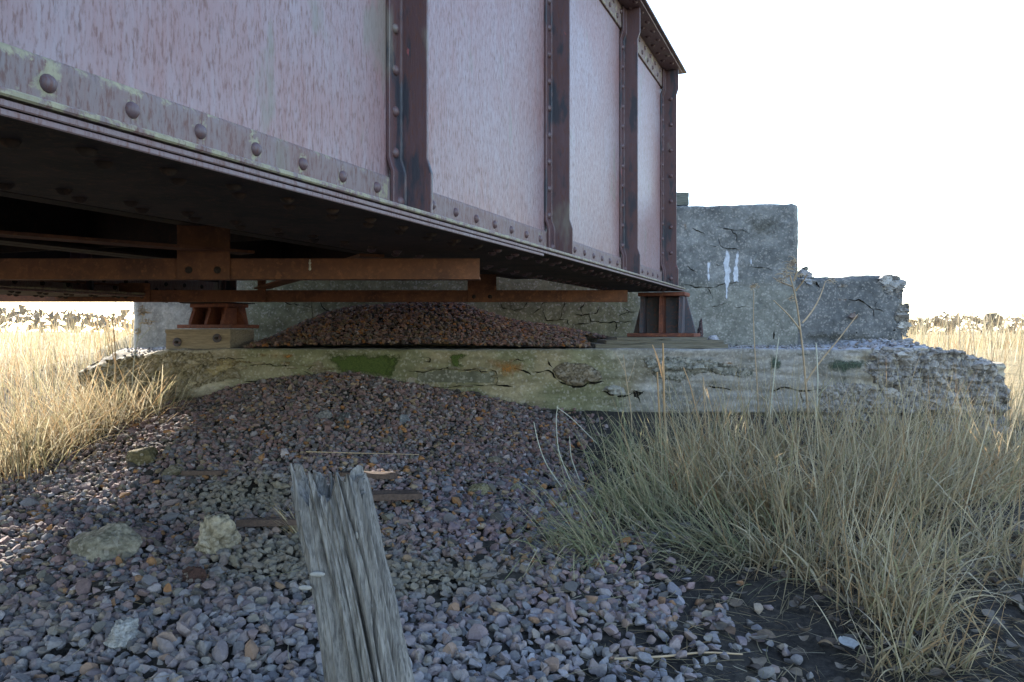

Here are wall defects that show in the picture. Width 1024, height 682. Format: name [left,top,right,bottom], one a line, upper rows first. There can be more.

crack [686,228,769,308]
leakage [723,251,739,299]
crack [501,302,631,331]
spalling [818,274,1011,435]
crack [410,357,646,401]